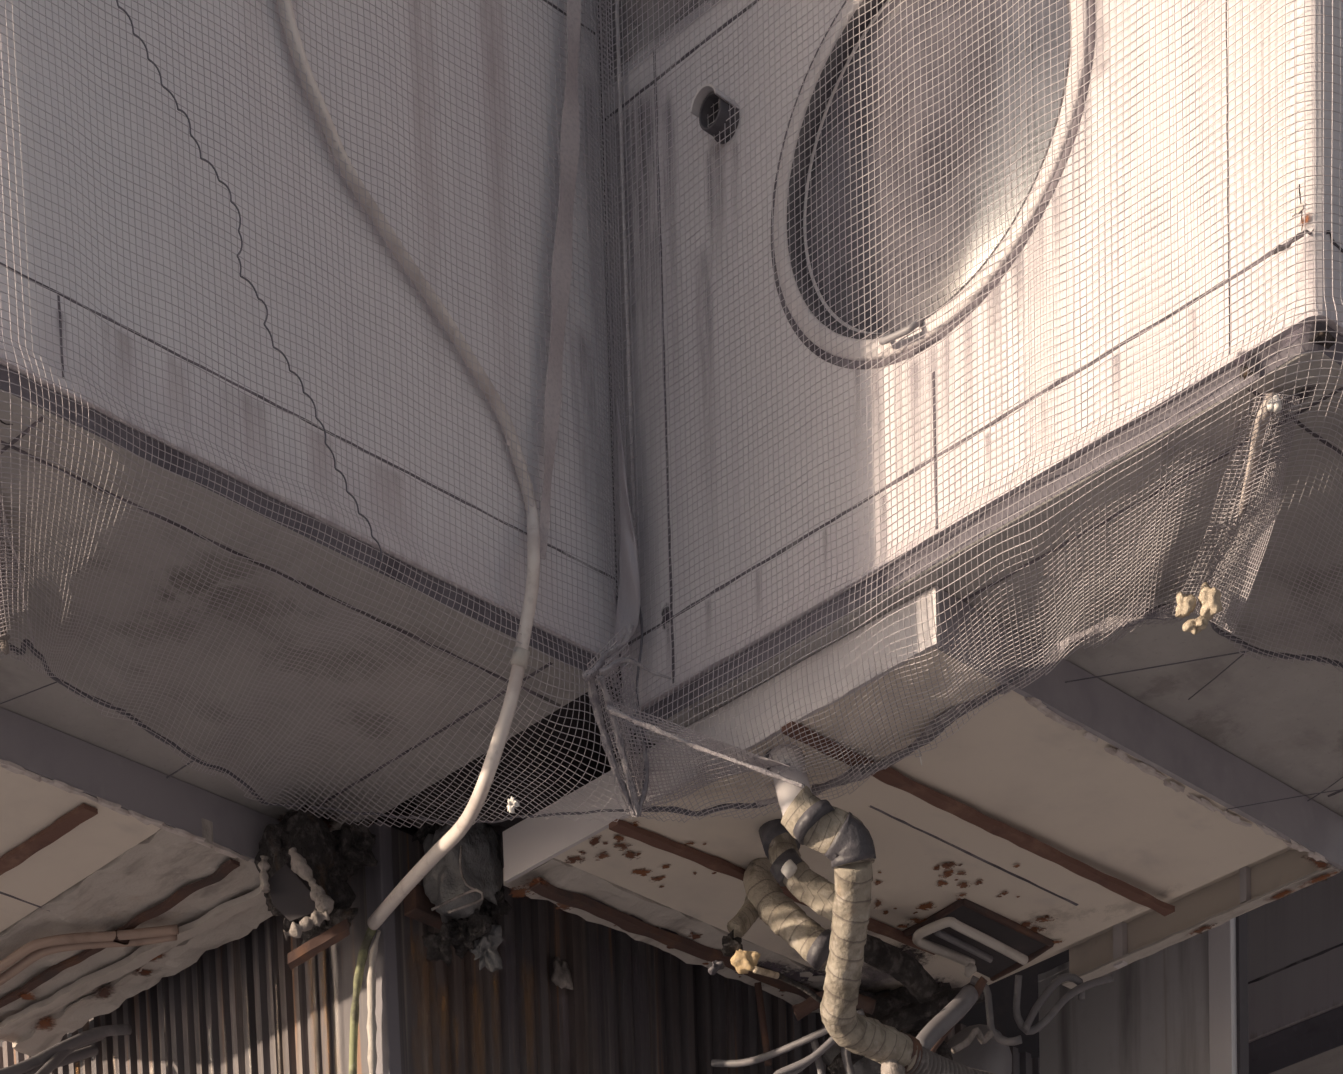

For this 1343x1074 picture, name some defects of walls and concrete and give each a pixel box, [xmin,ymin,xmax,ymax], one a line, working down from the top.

rust [565,821,671,888]
rust [933,862,983,900]
rust [897,902,935,928]
rust [1020,915,1062,944]
rust [134,954,164,976]
rust [36,1017,55,1031]